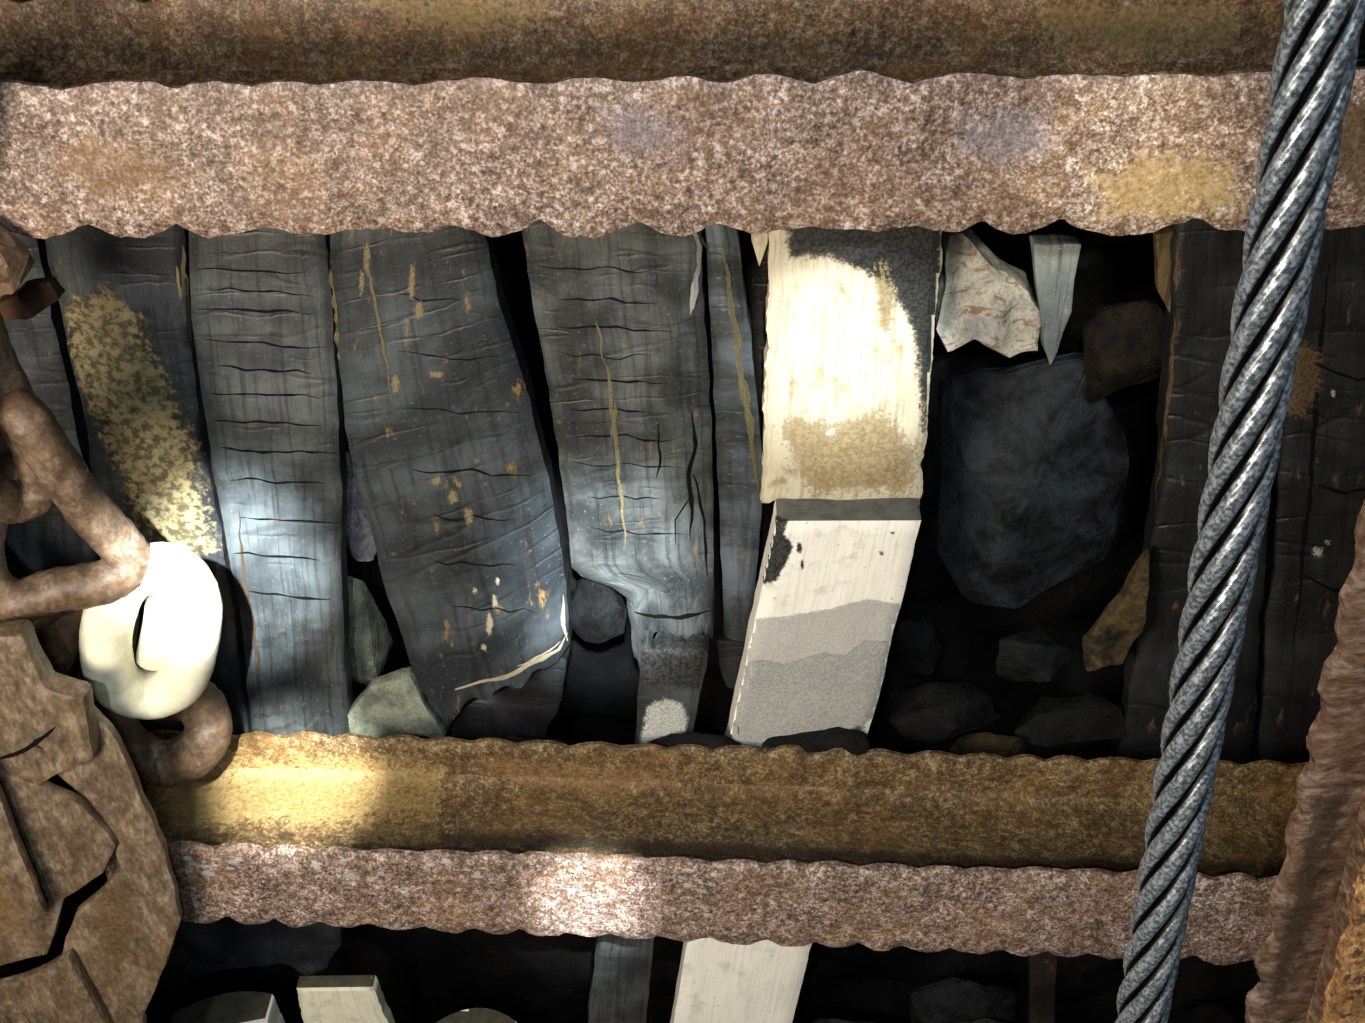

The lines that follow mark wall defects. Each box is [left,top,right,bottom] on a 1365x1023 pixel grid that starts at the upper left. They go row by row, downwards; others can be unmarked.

crack [0,727,56,760]